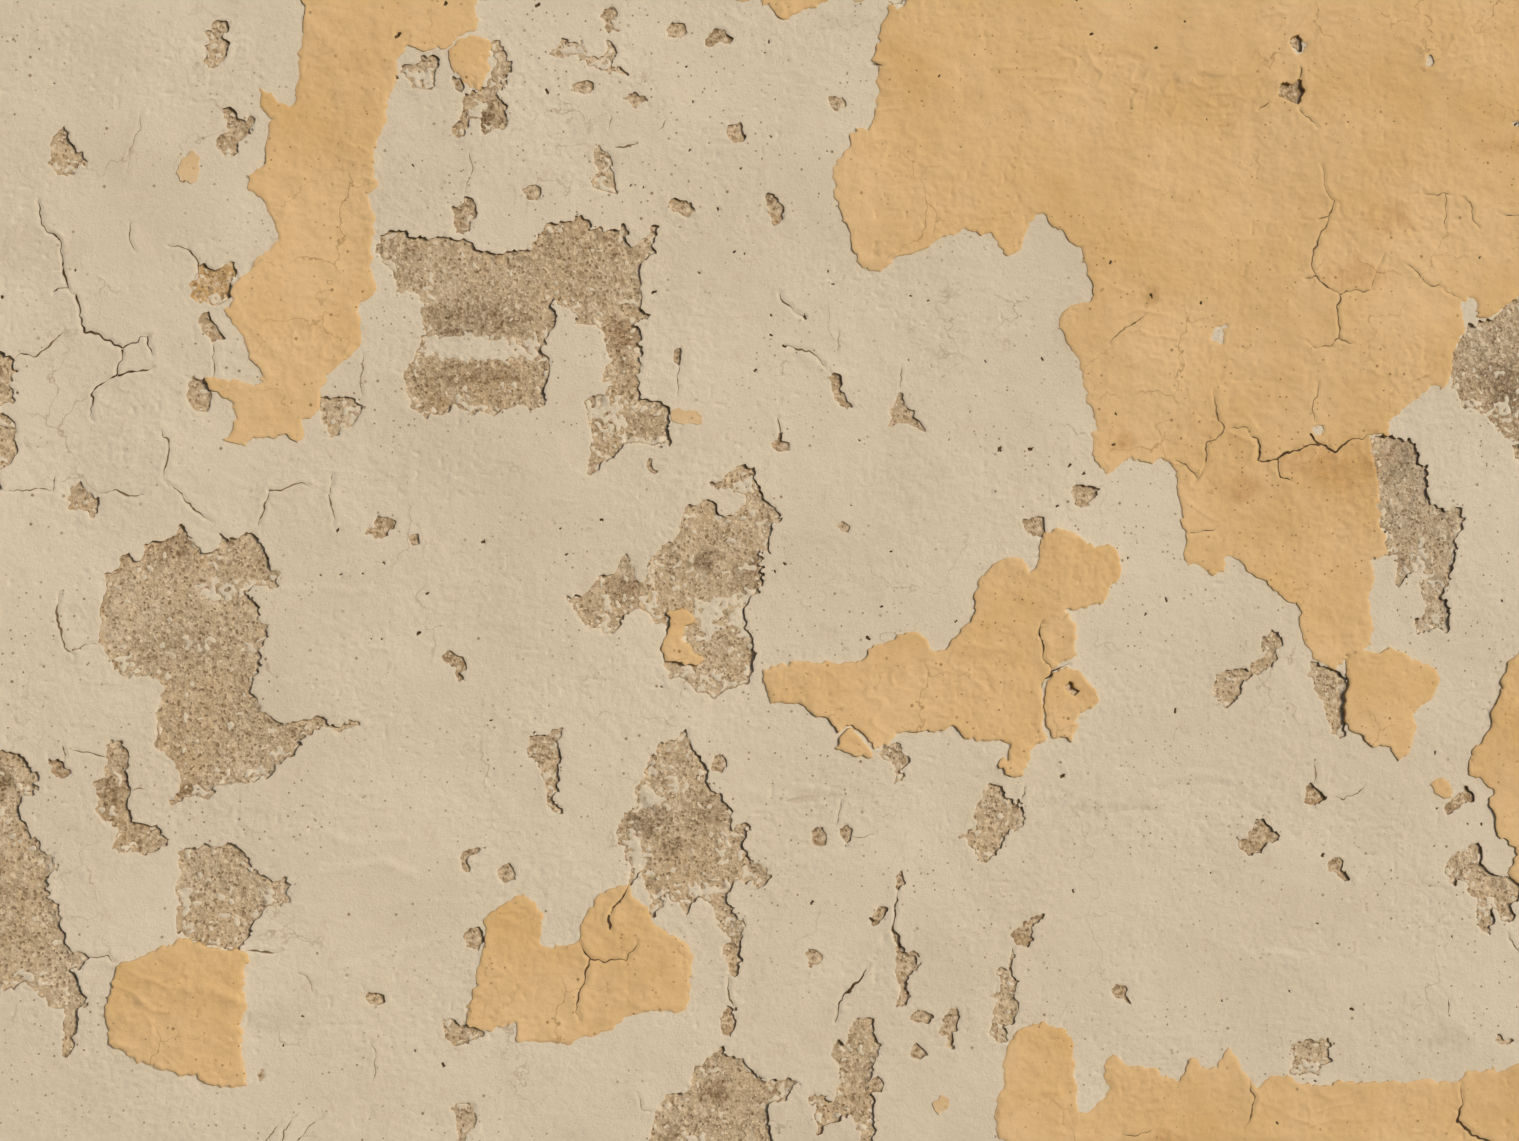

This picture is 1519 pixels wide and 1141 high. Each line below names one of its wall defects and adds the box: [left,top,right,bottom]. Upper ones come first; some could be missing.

crack [14,200,152,419]
crack [129,223,199,275]
peeling [187,0,702,475]
crack [1305,164,1458,348]
peeling [566,0,1519,862]
crack [1176,387,1374,483]
spalling [99,524,360,805]
peeling [0,740,291,1088]
crack [575,886,637,1021]
peeling [442,728,771,1045]
spalling [649,1005,884,1141]
crack [1456,1097,1491,1141]